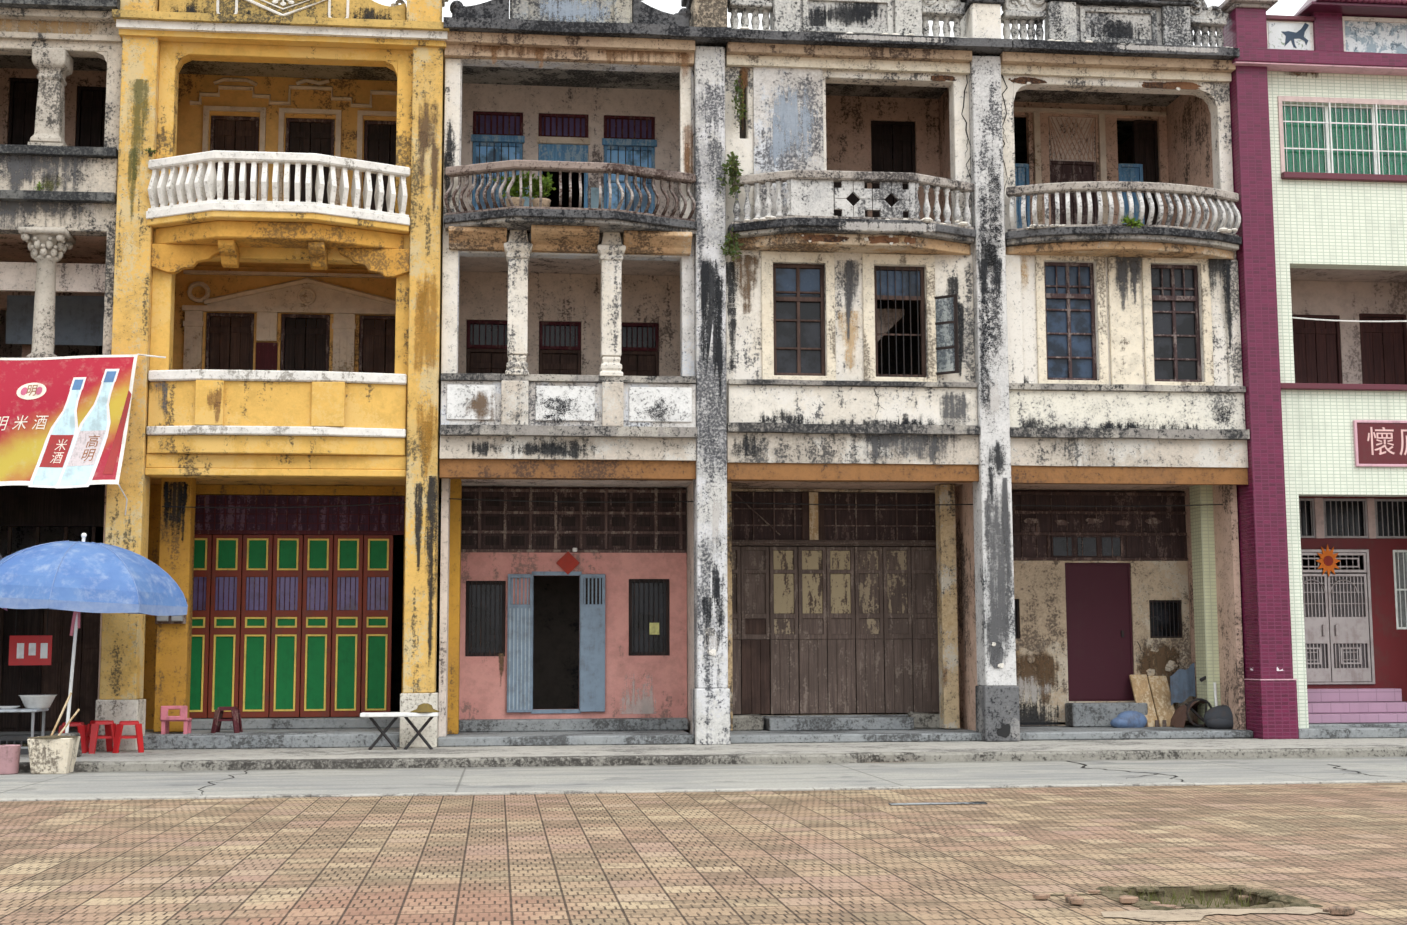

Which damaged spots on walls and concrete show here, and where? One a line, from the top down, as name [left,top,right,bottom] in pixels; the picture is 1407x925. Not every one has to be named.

leakage [699,255,759,399]
leakage [732,155,1004,462]
leakage [467,392,494,421]
leakage [536,393,579,425]
leakage [643,395,673,424]
leakage [468,440,596,459]
leakage [415,476,439,665]
leakage [985,442,1060,727]
crack [1067,761,1184,782]
spalling [1026,882,1355,921]